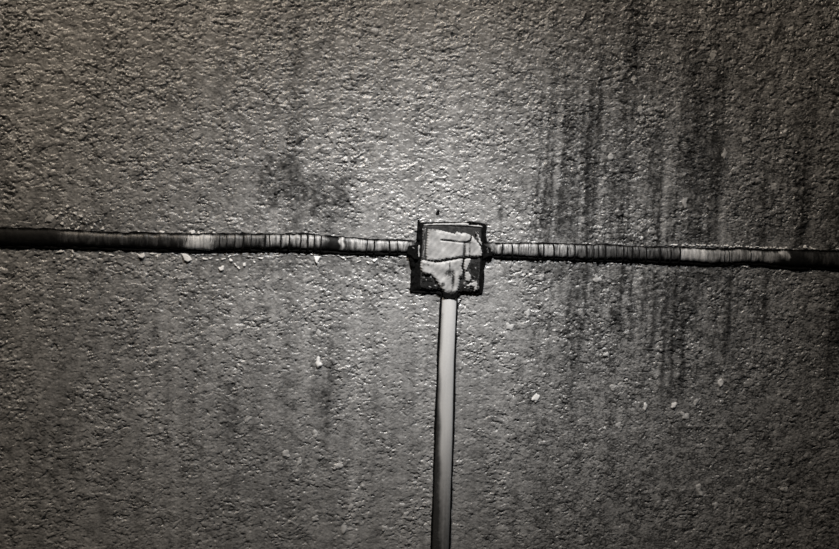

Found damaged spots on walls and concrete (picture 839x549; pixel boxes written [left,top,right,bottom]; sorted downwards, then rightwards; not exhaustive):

water stain [539,48,605,242]
water stain [645,176,677,243]
water stain [610,267,632,332]
water stain [642,272,696,382]